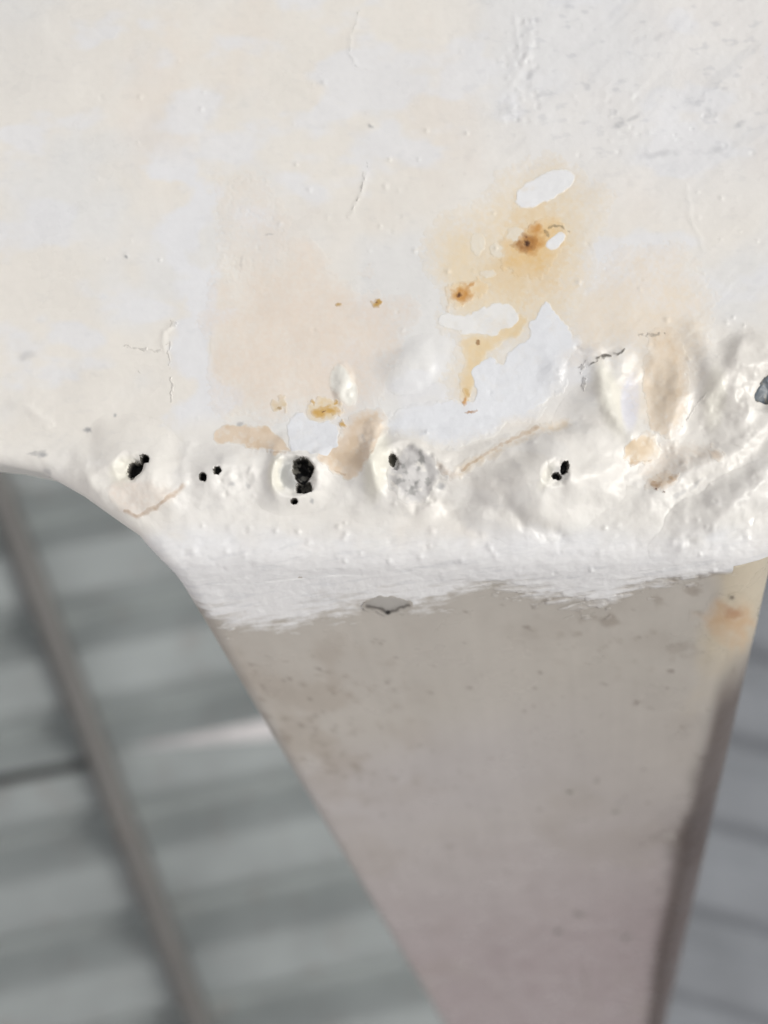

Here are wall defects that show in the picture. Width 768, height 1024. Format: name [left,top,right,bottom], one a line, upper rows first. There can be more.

peeling [514,169,575,208]
rust [499,215,568,287]
rust [444,275,489,313]
peeling [213,301,582,505]
peeling [362,596,413,616]